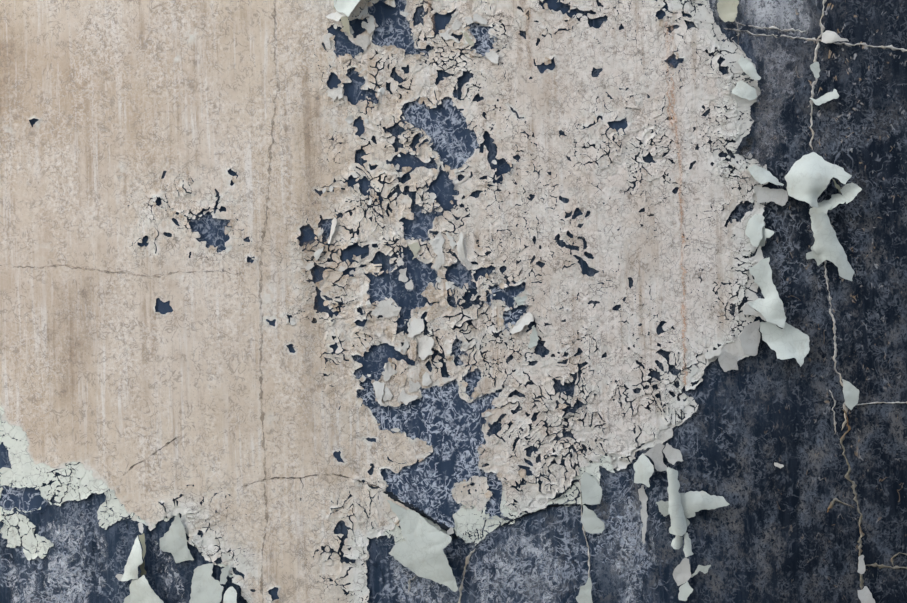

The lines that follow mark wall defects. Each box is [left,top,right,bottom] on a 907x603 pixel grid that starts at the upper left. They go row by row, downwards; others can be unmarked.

crack [724,0,907,150]
peeling [149,195,234,253]
peeling [155,298,173,314]
peeling [266,313,300,327]
peeling [294,0,862,603]
crack [824,260,907,590]
peeling [0,407,250,603]
peeling [268,587,279,603]